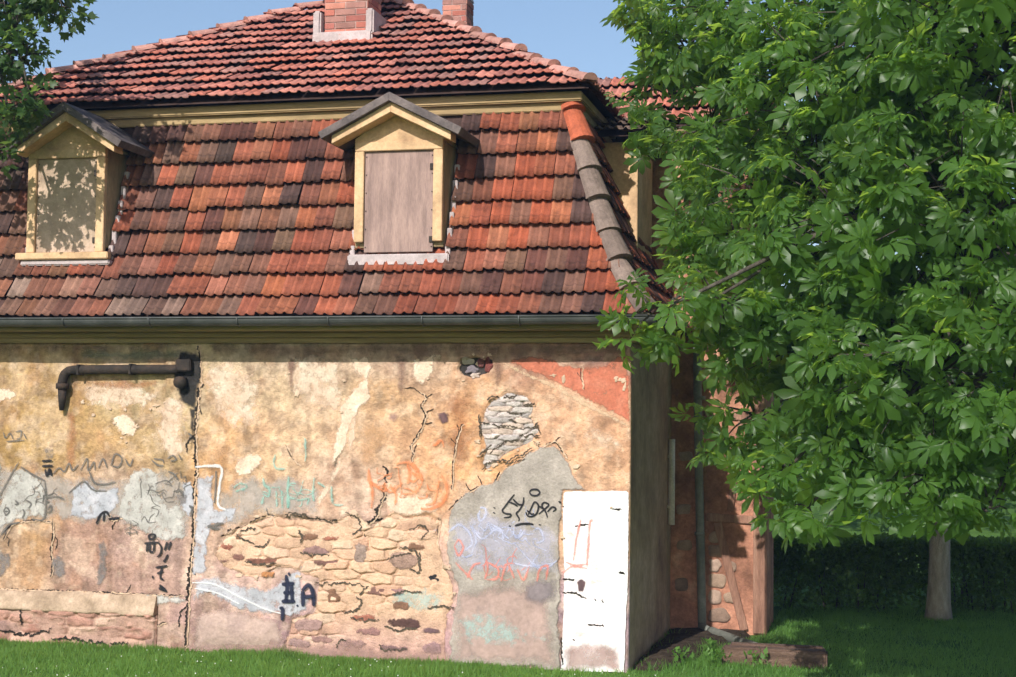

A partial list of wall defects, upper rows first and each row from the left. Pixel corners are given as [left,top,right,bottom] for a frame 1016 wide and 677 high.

crack [404,387,433,463]
flaking render [474,393,540,471]
crack [0,346,204,649]
crack [221,508,292,537]
crack [364,466,389,538]
crack [436,424,501,549]
flaking render [215,492,457,662]